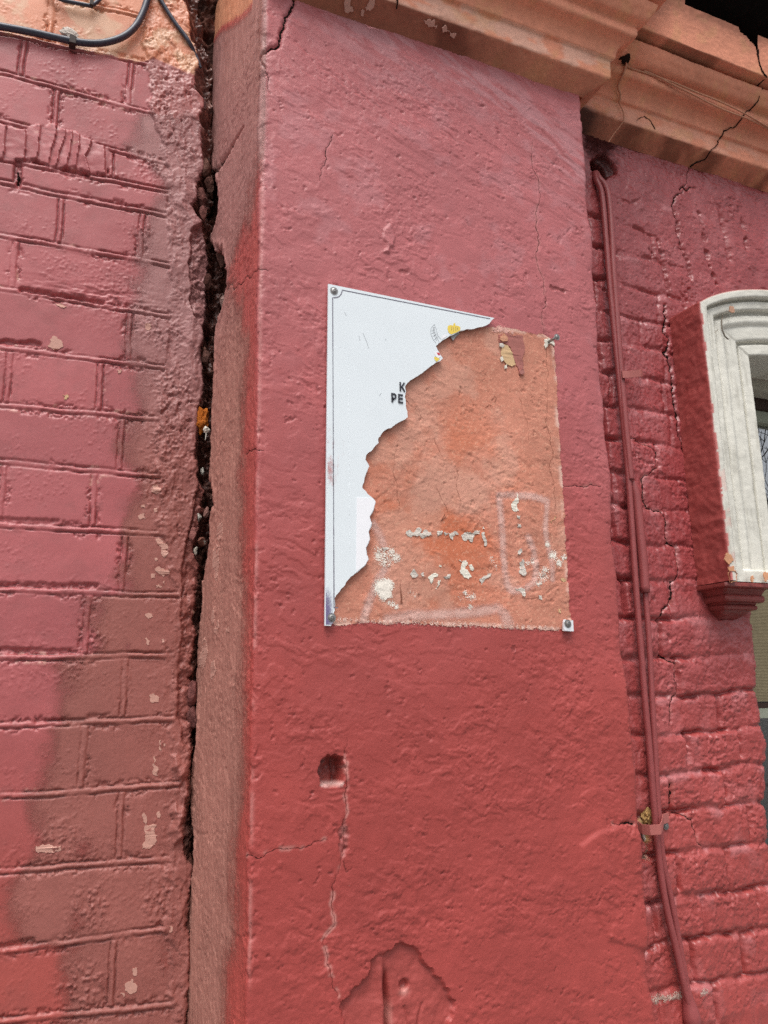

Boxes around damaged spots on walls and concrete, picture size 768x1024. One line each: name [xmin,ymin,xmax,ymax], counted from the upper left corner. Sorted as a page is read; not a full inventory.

crack [265,0,295,92]
crack [197,0,269,367]
crack [671,49,768,250]
crack [662,306,682,445]
crack [188,432,213,577]
crack [631,438,678,618]
crack [187,680,197,744]
spalling [310,754,346,795]
crack [246,737,350,995]
spalling [339,942,457,1024]